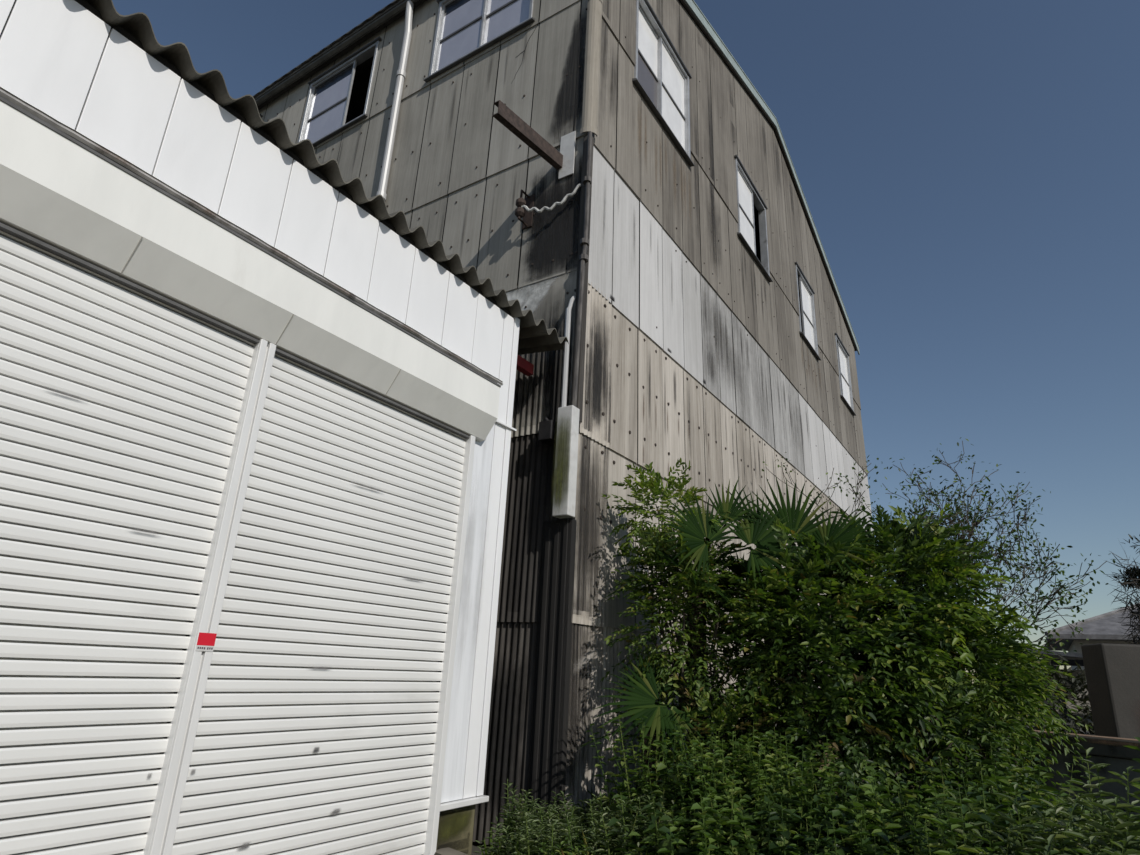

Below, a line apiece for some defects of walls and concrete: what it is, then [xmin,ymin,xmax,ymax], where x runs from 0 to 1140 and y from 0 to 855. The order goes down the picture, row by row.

damp [553,16,586,135]
damp [602,0,617,101]
damp [506,164,582,313]
damp [513,316,611,767]